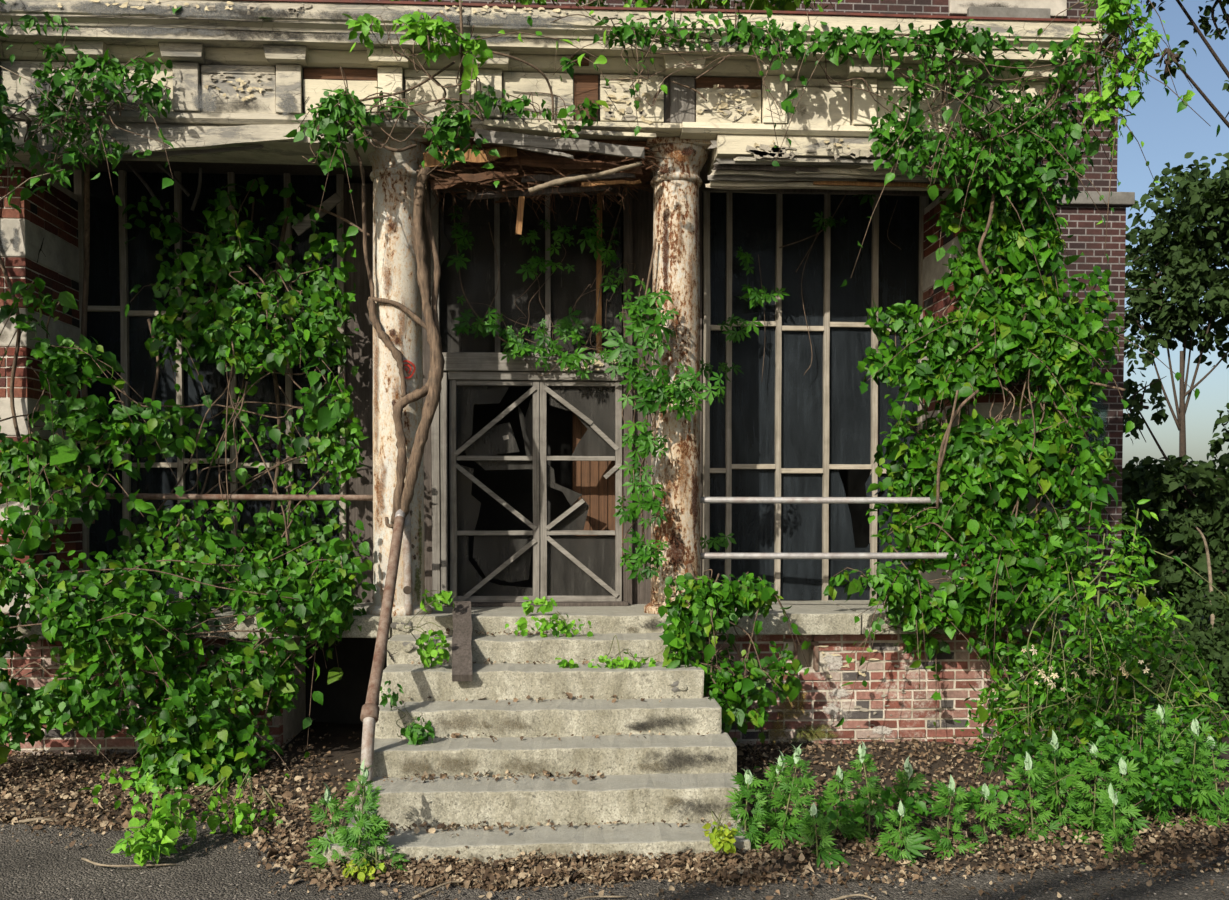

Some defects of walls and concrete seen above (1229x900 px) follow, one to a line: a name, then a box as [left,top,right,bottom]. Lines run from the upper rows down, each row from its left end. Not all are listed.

peeling [440,5,568,18]
peeling [204,72,272,101]
peeling [602,77,663,124]
peeling [695,84,758,123]
rust [662,204,698,342]
rust [376,470,386,524]
rust [665,430,697,570]
leakage [823,653,843,671]
leakage [823,688,850,718]
leakage [872,726,892,734]